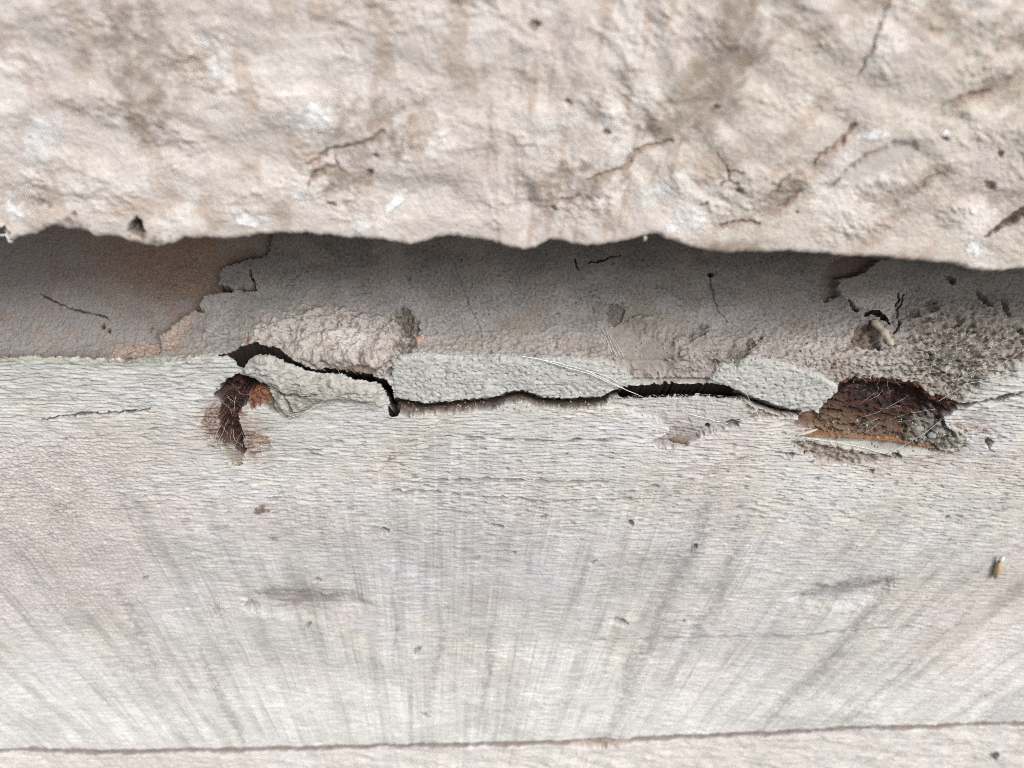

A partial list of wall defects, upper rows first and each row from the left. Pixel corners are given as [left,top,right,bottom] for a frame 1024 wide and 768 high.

corrosion [202,373,278,466]
crack [219,342,802,418]
spalling [602,256,1024,474]
corrosion [809,430,943,453]